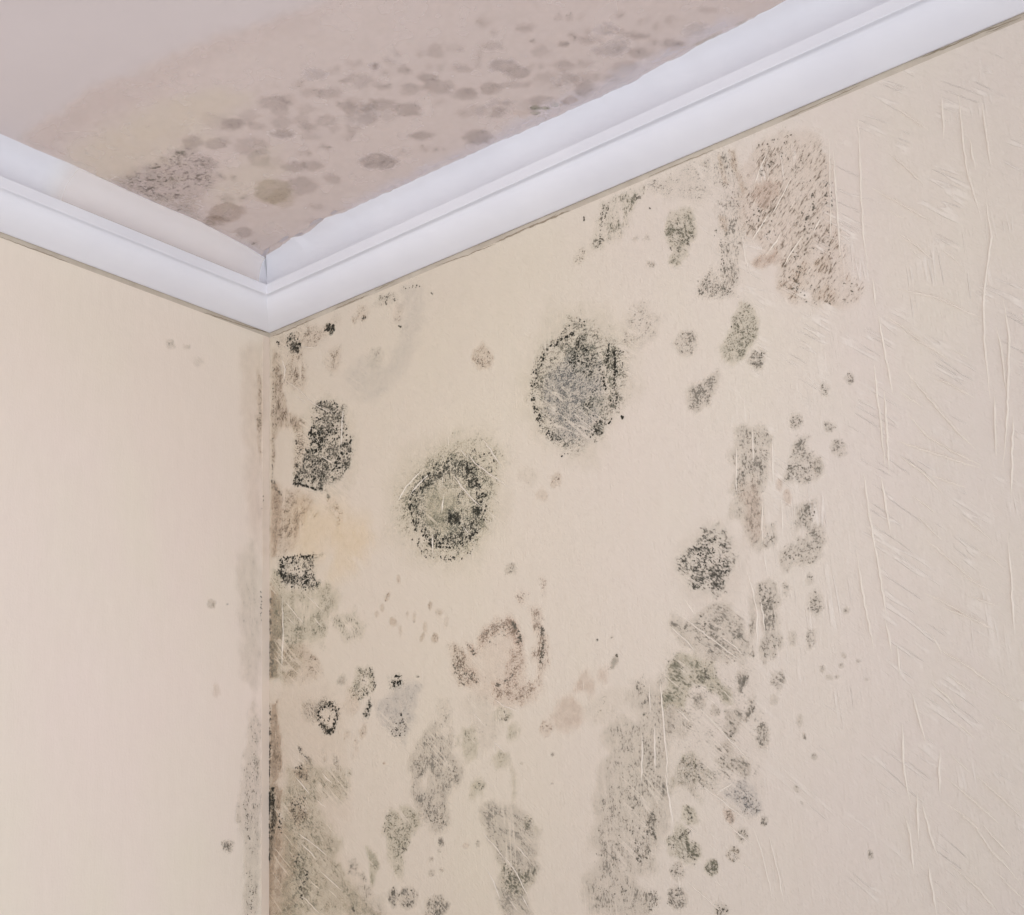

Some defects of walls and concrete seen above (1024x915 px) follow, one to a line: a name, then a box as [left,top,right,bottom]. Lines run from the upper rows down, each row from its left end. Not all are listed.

damp [577,180,669,260]
damp [664,211,696,265]
damp [688,134,863,305]
damp [530,318,632,457]
damp [257,323,360,678]
damp [401,433,503,562]
damp [733,426,775,547]
damp [339,667,376,718]
damp [453,609,548,700]
damp [588,528,814,912]
damp [243,701,459,915]
damp [483,805,536,915]